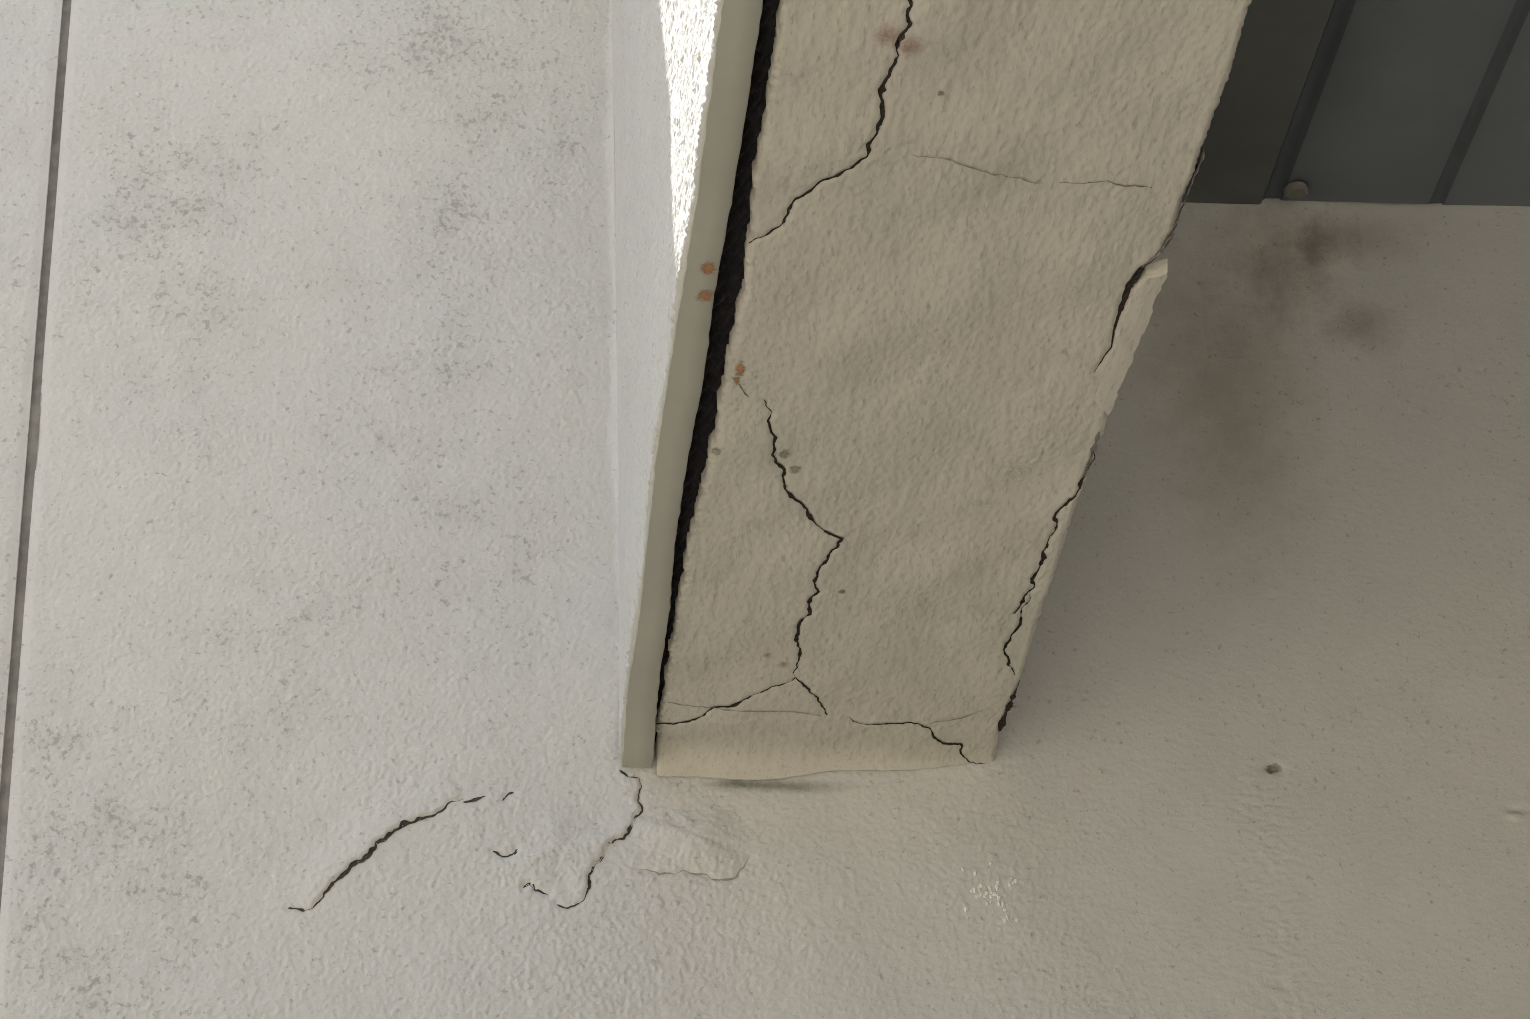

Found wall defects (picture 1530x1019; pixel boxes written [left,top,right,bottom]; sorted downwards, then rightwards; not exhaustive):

crack [749,0,913,243]
crack [914,155,1152,188]
crack [656,377,983,764]
crack [1003,449,1095,675]
crack [288,792,514,912]
crack [493,770,749,909]